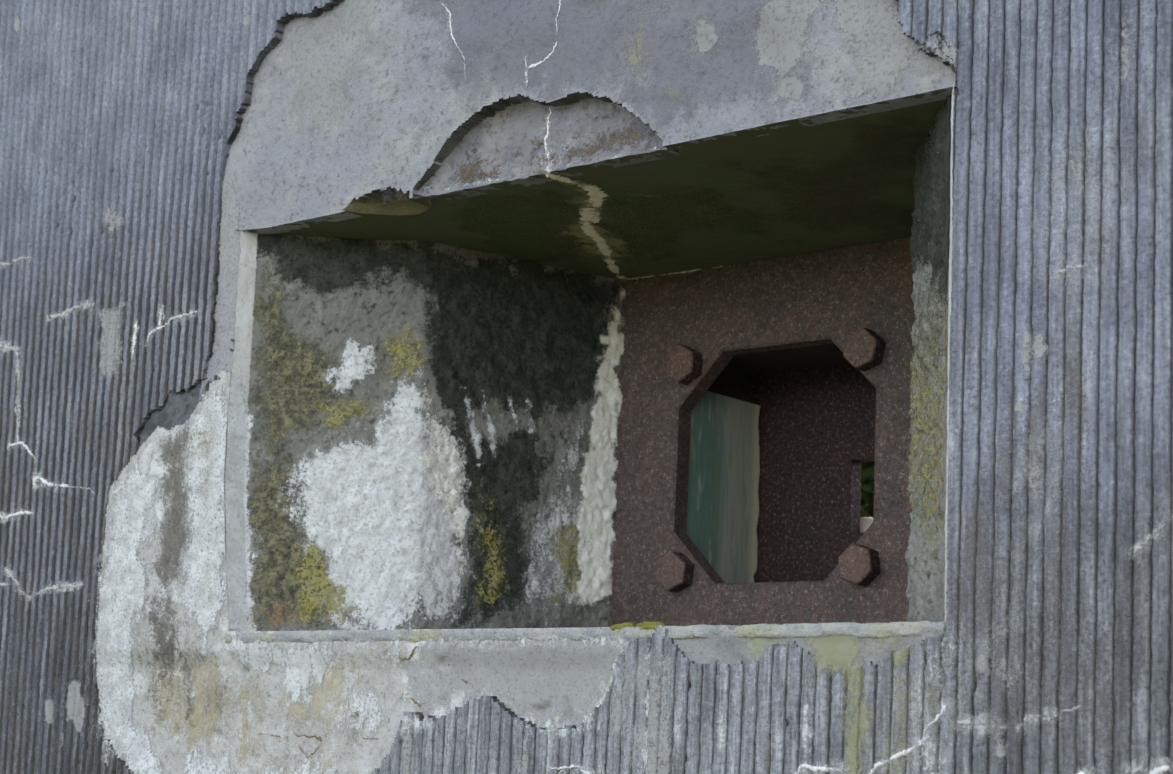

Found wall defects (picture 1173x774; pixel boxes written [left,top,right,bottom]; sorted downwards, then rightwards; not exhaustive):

crack [437,0,466,80]
crack [523,0,722,281]
crack [46,300,94,322]
crack [131,305,198,358]
spalling [96,0,957,774]
crack [0,338,98,523]
water stain [0,164,679,774]
crack [0,566,84,601]
crack [549,764,595,774]
water stain [802,704,812,752]
crack [791,698,1081,774]
crack [1077,757,1173,774]